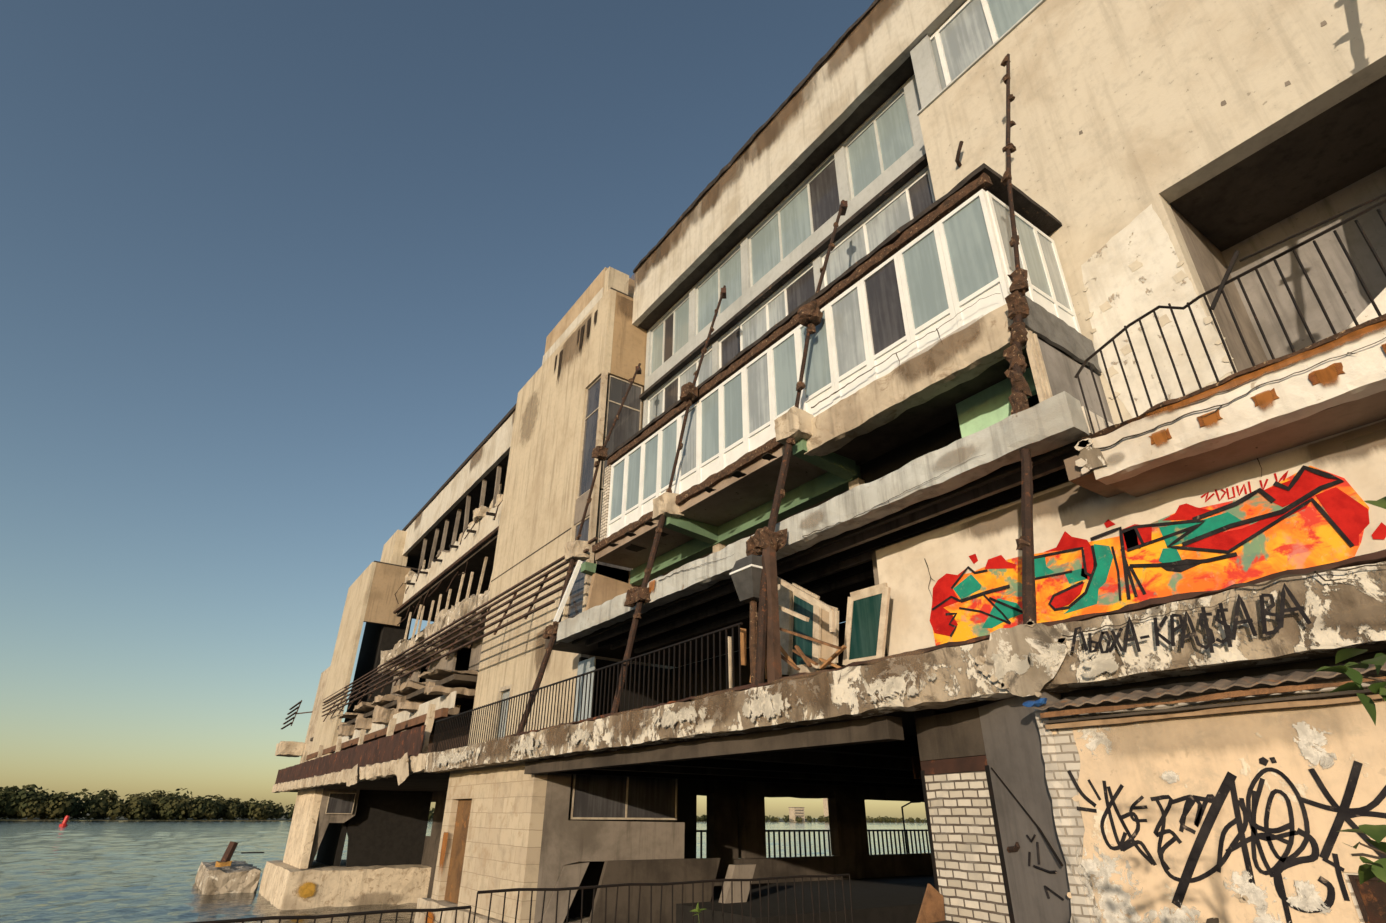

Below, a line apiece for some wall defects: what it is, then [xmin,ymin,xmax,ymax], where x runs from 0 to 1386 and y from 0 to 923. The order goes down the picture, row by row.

water stain [620,0,901,317]
spalling [975,619,1119,697]
peeling [853,670,937,703]
peeling [638,705,707,729]
peeling [742,692,803,723]
spalling [345,764,358,786]
spalling [394,753,409,786]
peeling [433,748,479,767]
peeling [566,727,591,747]
flaking render [1291,721,1337,769]
flaking render [1050,715,1219,923]
flaking render [1224,868,1331,923]